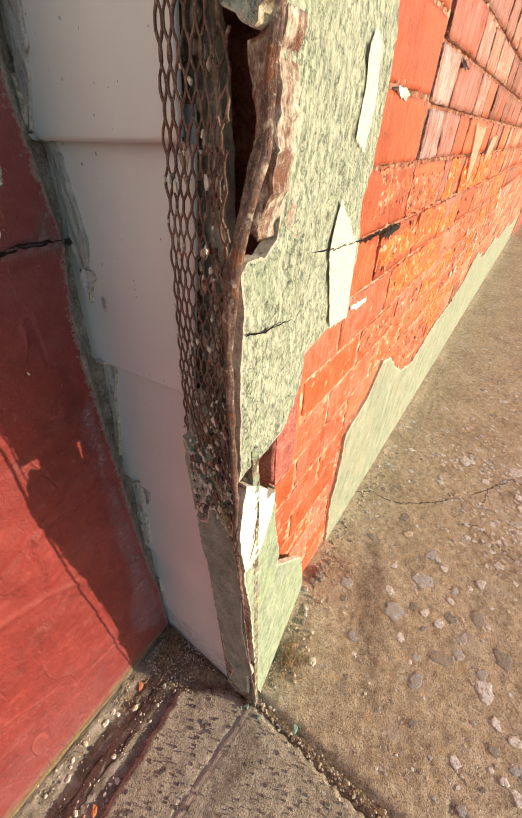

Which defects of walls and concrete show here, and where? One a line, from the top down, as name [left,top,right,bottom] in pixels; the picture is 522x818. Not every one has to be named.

flaking render [179,54,193,98]
peeling [357,26,382,152]
flaking render [197,148,229,200]
crack [0,239,65,258]
flaking render [202,220,226,293]
peeling [329,200,367,328]
crack [312,223,401,253]
spalling [357,150,513,367]
flaking render [176,333,212,383]
flaking render [188,363,276,574]
crack [355,479,522,506]